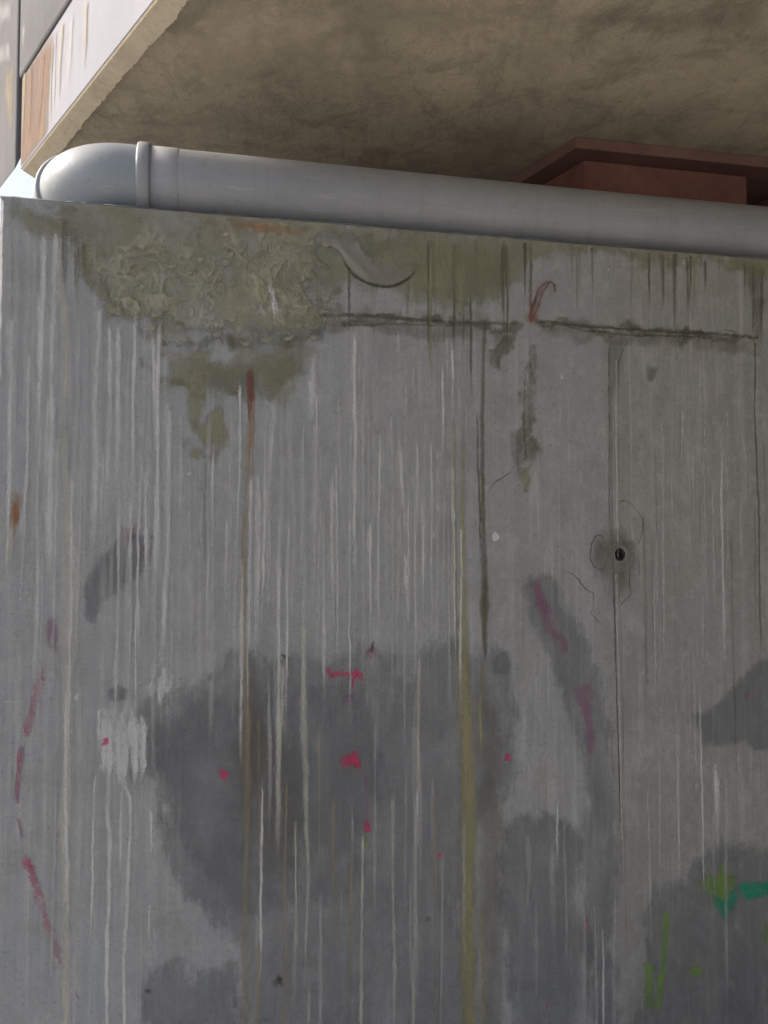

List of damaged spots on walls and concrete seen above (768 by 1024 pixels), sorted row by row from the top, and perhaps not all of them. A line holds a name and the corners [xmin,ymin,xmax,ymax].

peeling [58,204,405,347]
water stain [402,230,565,451]
crack [540,318,739,343]
rust [245,371,254,494]
water stain [451,460,489,1024]